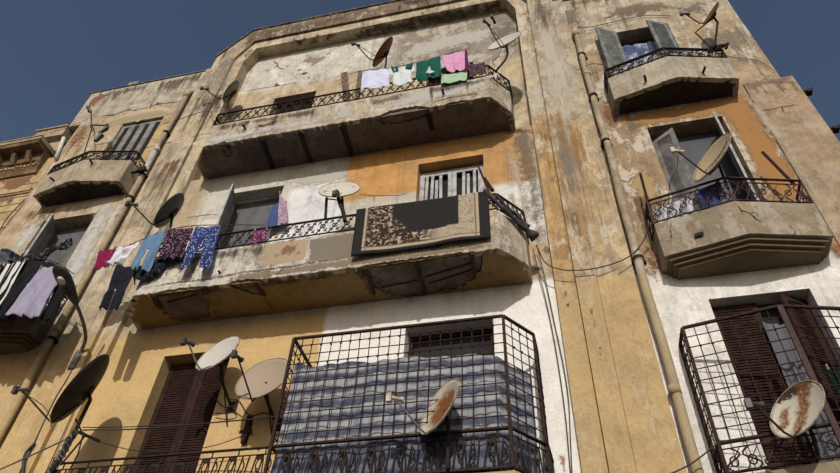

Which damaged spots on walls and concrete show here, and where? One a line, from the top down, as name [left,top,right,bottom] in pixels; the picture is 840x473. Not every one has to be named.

spalling [212,232,503,298]
spalling [150,284,211,321]